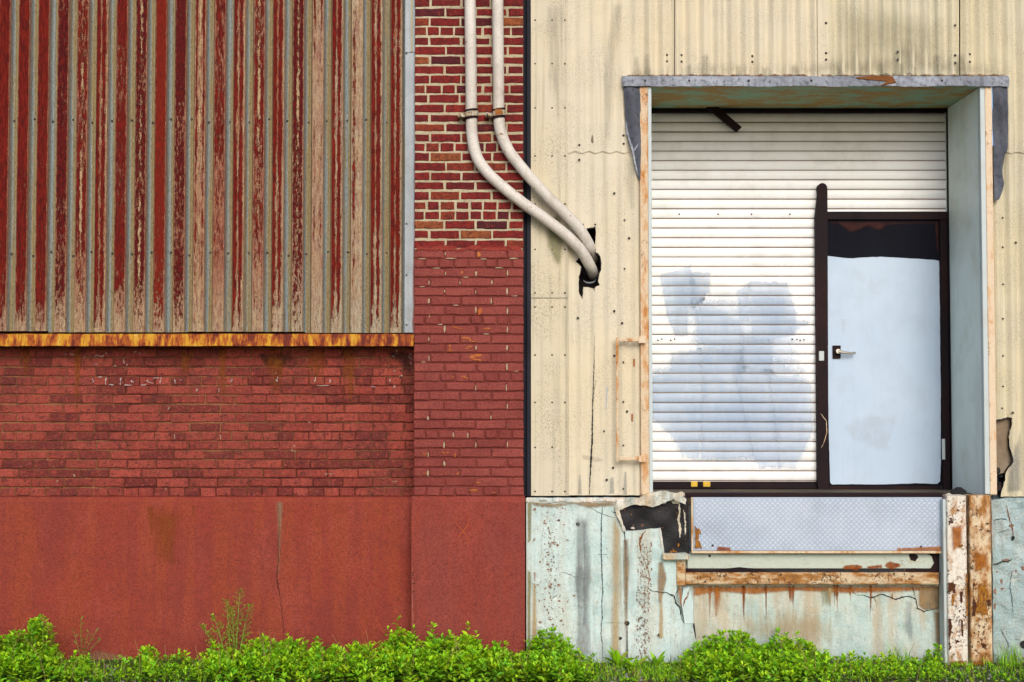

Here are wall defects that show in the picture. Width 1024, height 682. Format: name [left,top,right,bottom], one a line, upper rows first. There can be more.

hole [576,227,602,298]
crack [589,335,684,658]
spalling [992,417,1014,499]
crack [276,528,285,639]
spalling [614,490,690,661]
rust [639,531,666,638]
rust [694,554,991,666]
crack [851,588,939,612]